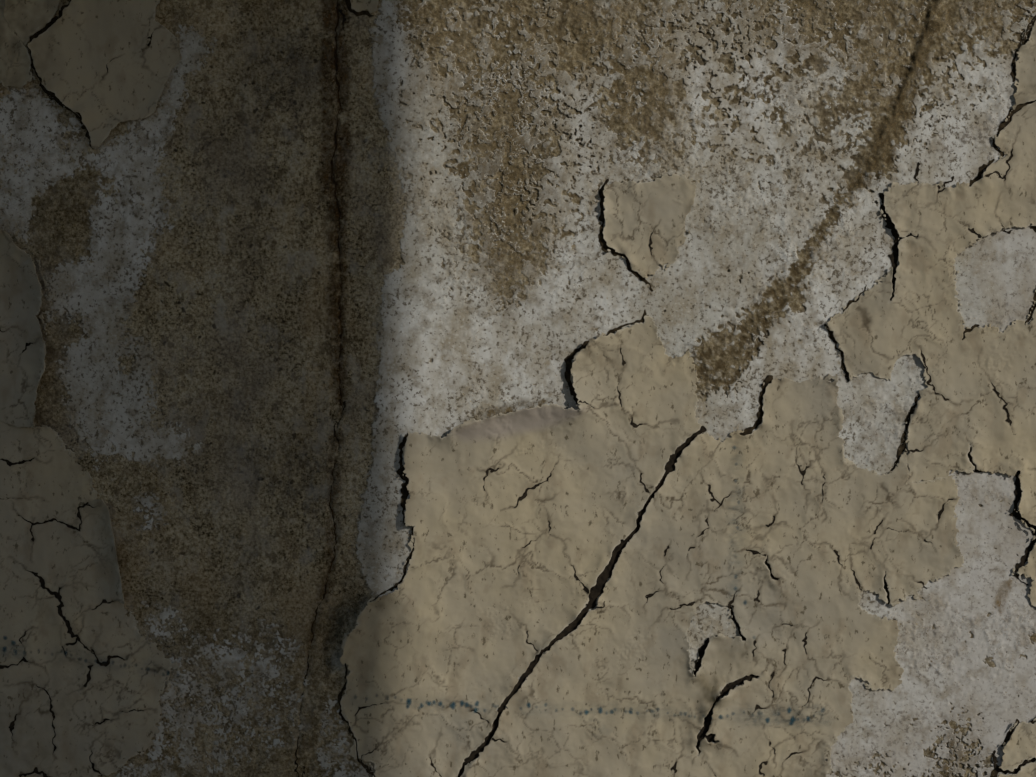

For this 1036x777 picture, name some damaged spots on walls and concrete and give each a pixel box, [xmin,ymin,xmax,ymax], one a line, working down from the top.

peeling [0,0,182,149]
crack [879,193,918,301]
crack [824,285,867,382]
peeling [336,21,1036,777]
crack [890,350,949,471]
crack [26,570,125,687]
peeling [0,229,180,777]
crack [374,433,414,600]
crack [430,426,709,777]
crack [644,484,731,610]
crack [834,550,890,605]
crack [1009,470,1036,586]